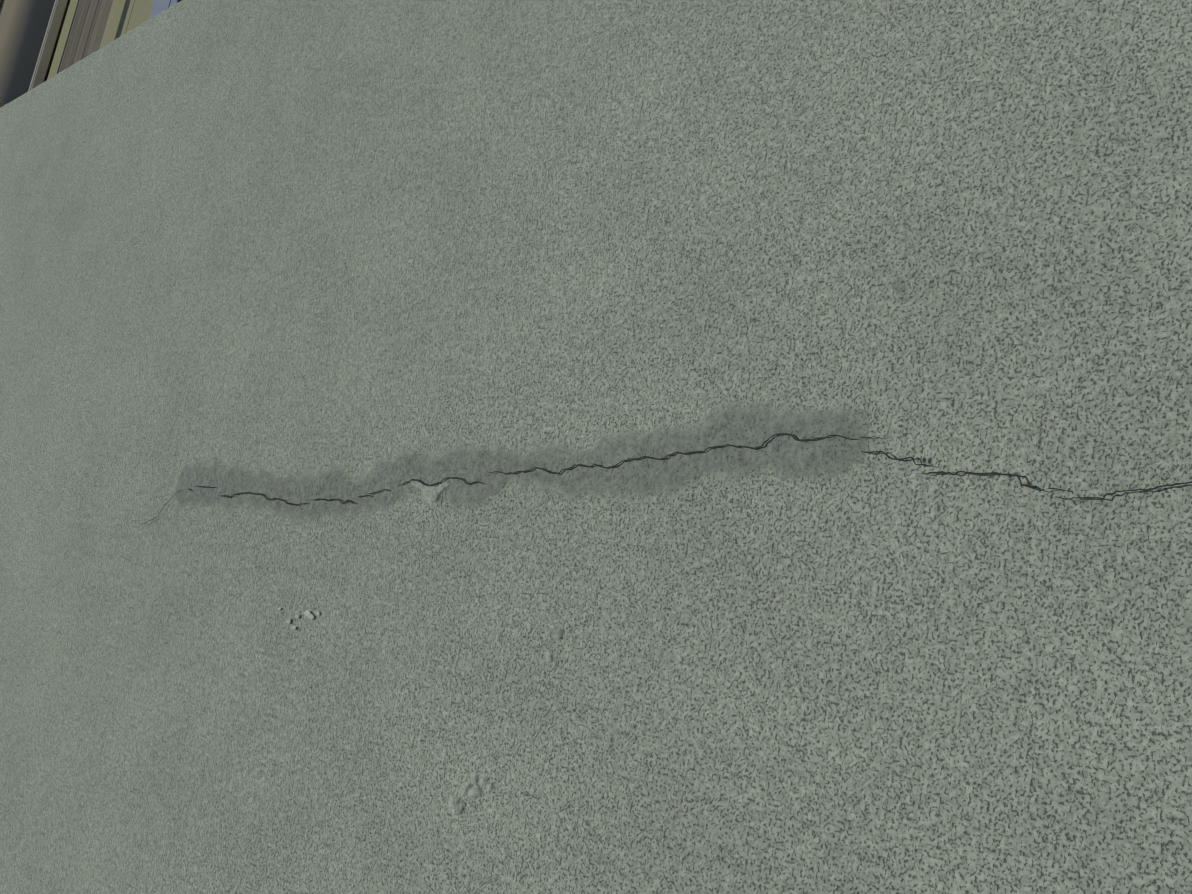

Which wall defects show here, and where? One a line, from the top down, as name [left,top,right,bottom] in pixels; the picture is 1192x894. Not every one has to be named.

water stain [175,407,861,517]
crack [141,433,1192,524]